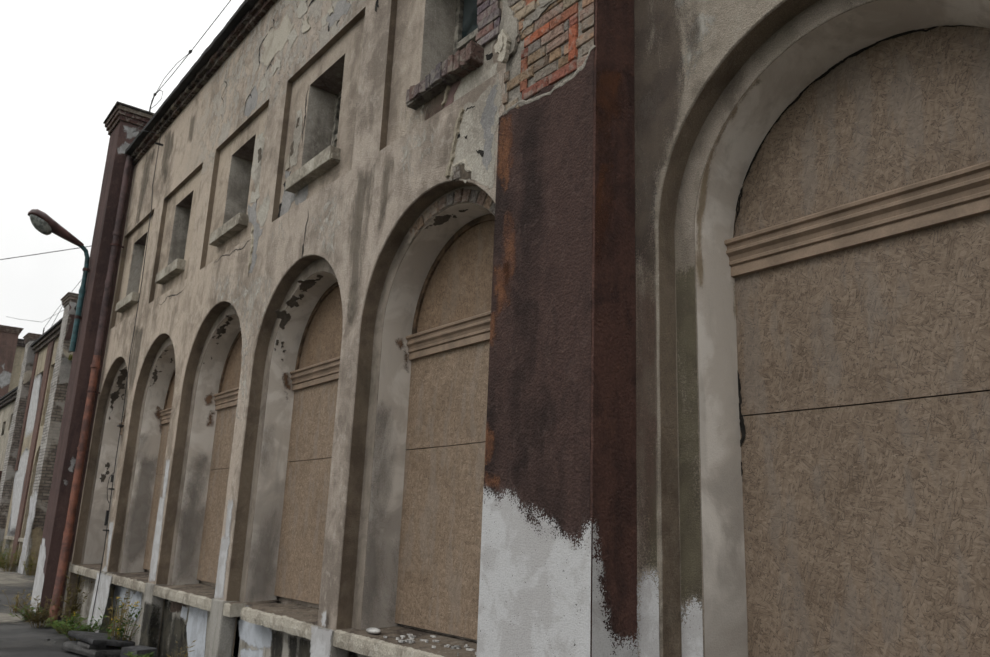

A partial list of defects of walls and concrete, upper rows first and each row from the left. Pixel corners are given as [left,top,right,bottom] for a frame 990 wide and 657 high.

peeling [244,0,351,117]
flaking render [404,0,596,245]
corrosion [497,115,513,191]
peeling [212,315,233,345]
peeling [274,275,323,361]
peeling [109,369,127,420]
crack [737,370,745,476]
peeling [383,485,659,657]
peeling [681,594,703,657]